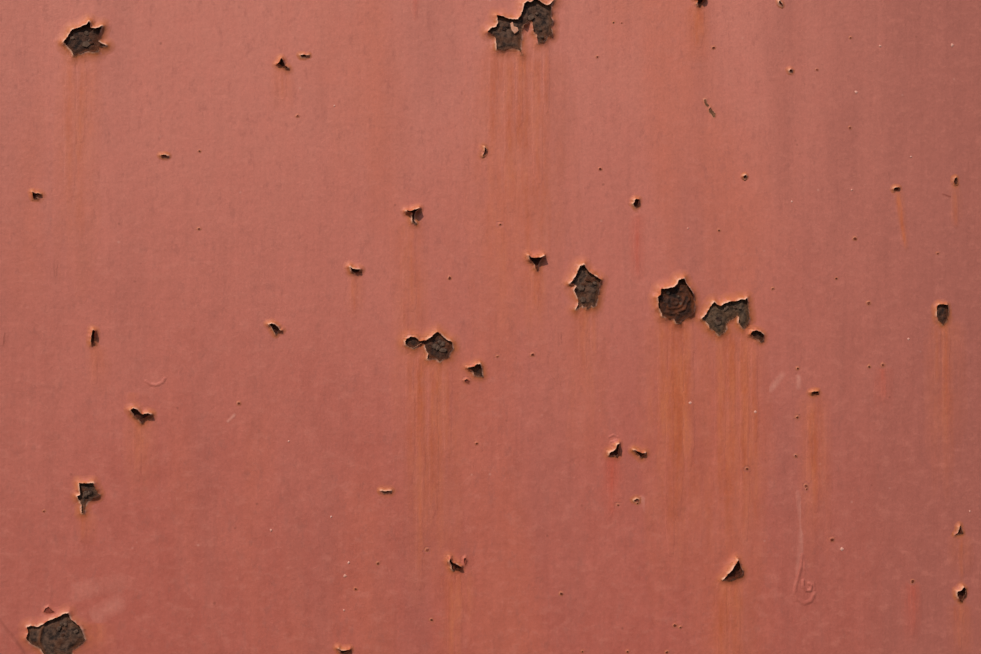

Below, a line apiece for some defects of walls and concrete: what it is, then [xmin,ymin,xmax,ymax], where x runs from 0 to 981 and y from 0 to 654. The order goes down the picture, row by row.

peeling [54,12,116,58]
peeling [478,0,560,56]
peeling [565,255,609,311]
peeling [647,269,766,345]
peeling [931,299,952,327]
peeling [403,325,456,363]
corrosion [378,40,585,654]
peeling [69,475,106,515]
corrosion [601,312,777,654]
peeling [720,556,744,582]
peeling [17,603,88,654]